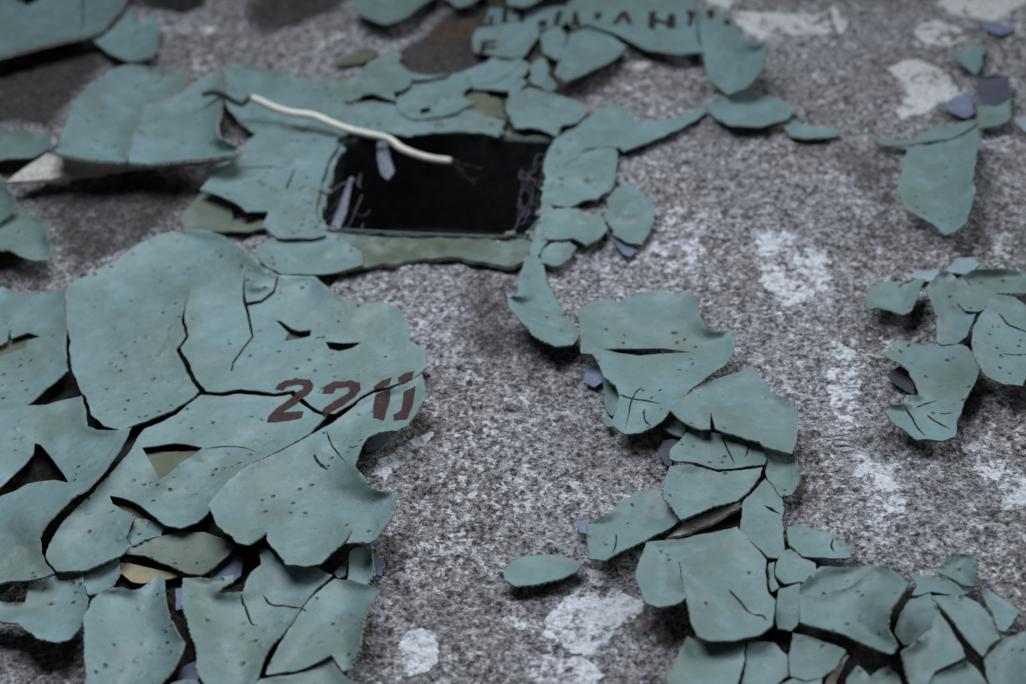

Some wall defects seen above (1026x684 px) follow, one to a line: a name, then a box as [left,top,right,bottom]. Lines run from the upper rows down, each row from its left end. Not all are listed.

peeling [0,0,160,62]
peeling [872,44,1026,236]
peeling [0,62,427,684]
peeling [324,0,908,654]
peeling [866,257,1026,442]
crack [49,319,358,575]
crack [719,434,749,463]
crack [241,594,306,625]
crack [729,589,767,621]
peeling [665,633,849,684]
peeling [846,665,901,684]
peeling [895,553,1026,684]